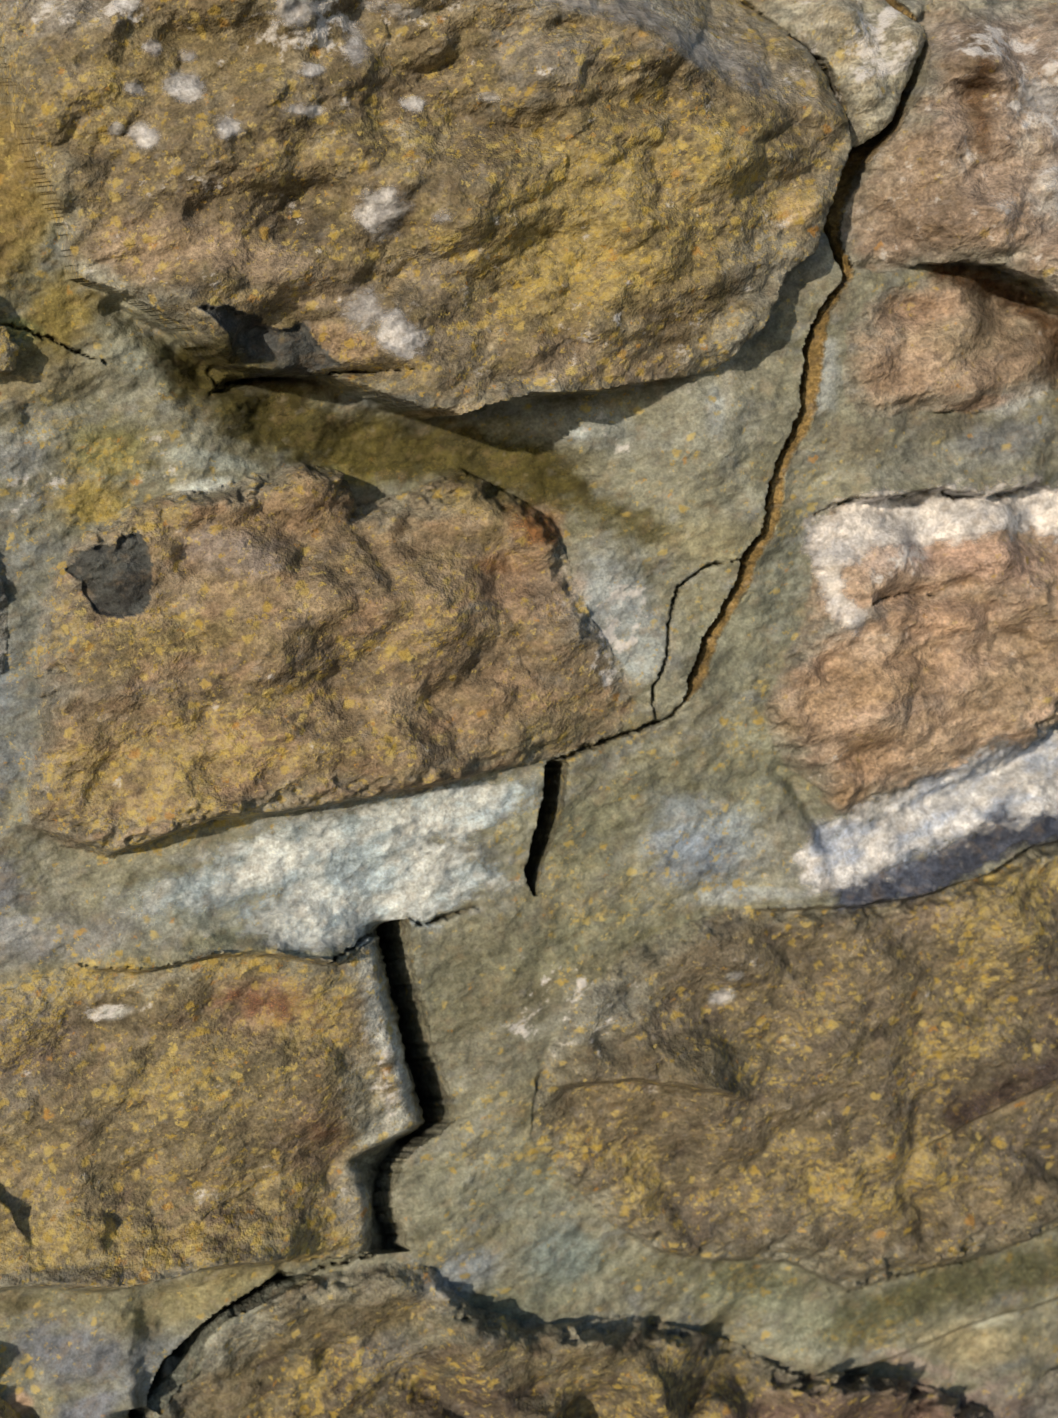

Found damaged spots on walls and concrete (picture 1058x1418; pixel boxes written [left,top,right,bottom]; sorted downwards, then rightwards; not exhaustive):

crack [8,325,78,353]
crack [524,0,926,897]
crack [886,488,958,500]
crack [128,912,460,1418]